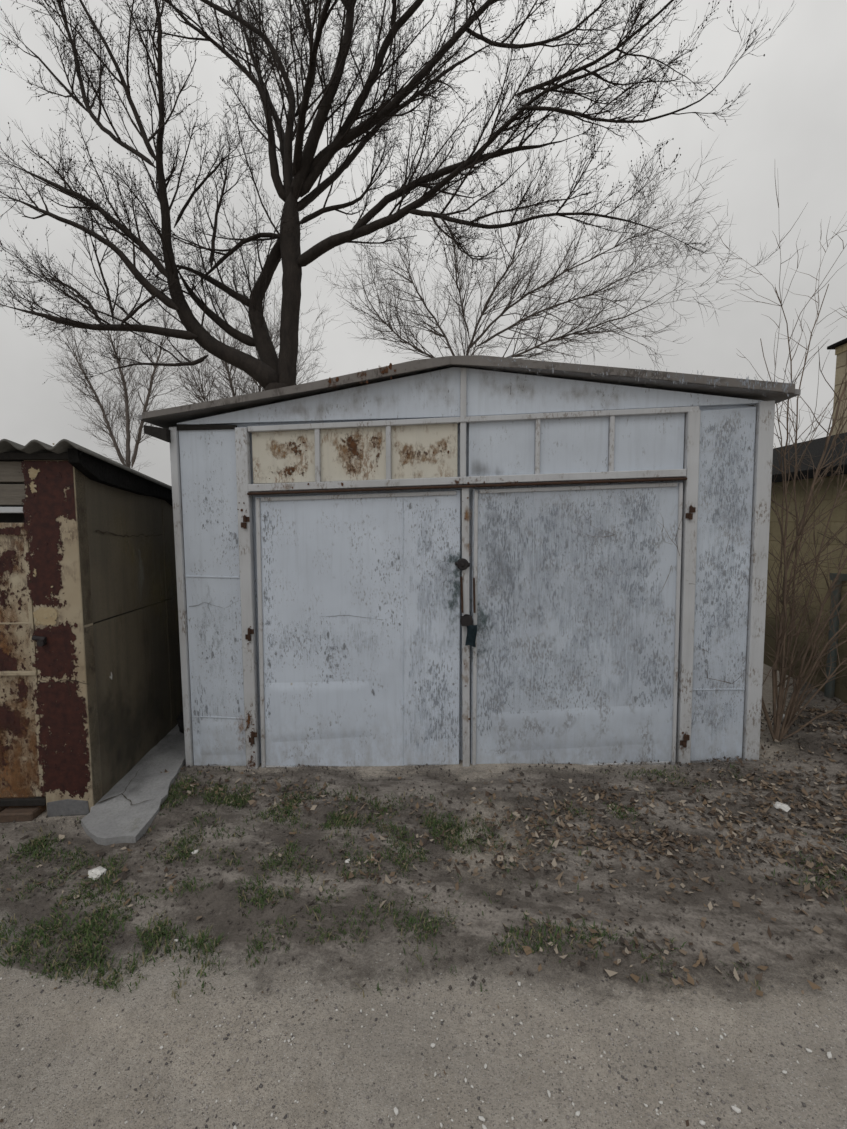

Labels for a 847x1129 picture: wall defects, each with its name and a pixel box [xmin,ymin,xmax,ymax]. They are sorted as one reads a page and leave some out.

rust [269,437,309,489]
rust [334,435,382,486]
rust [395,441,449,465]